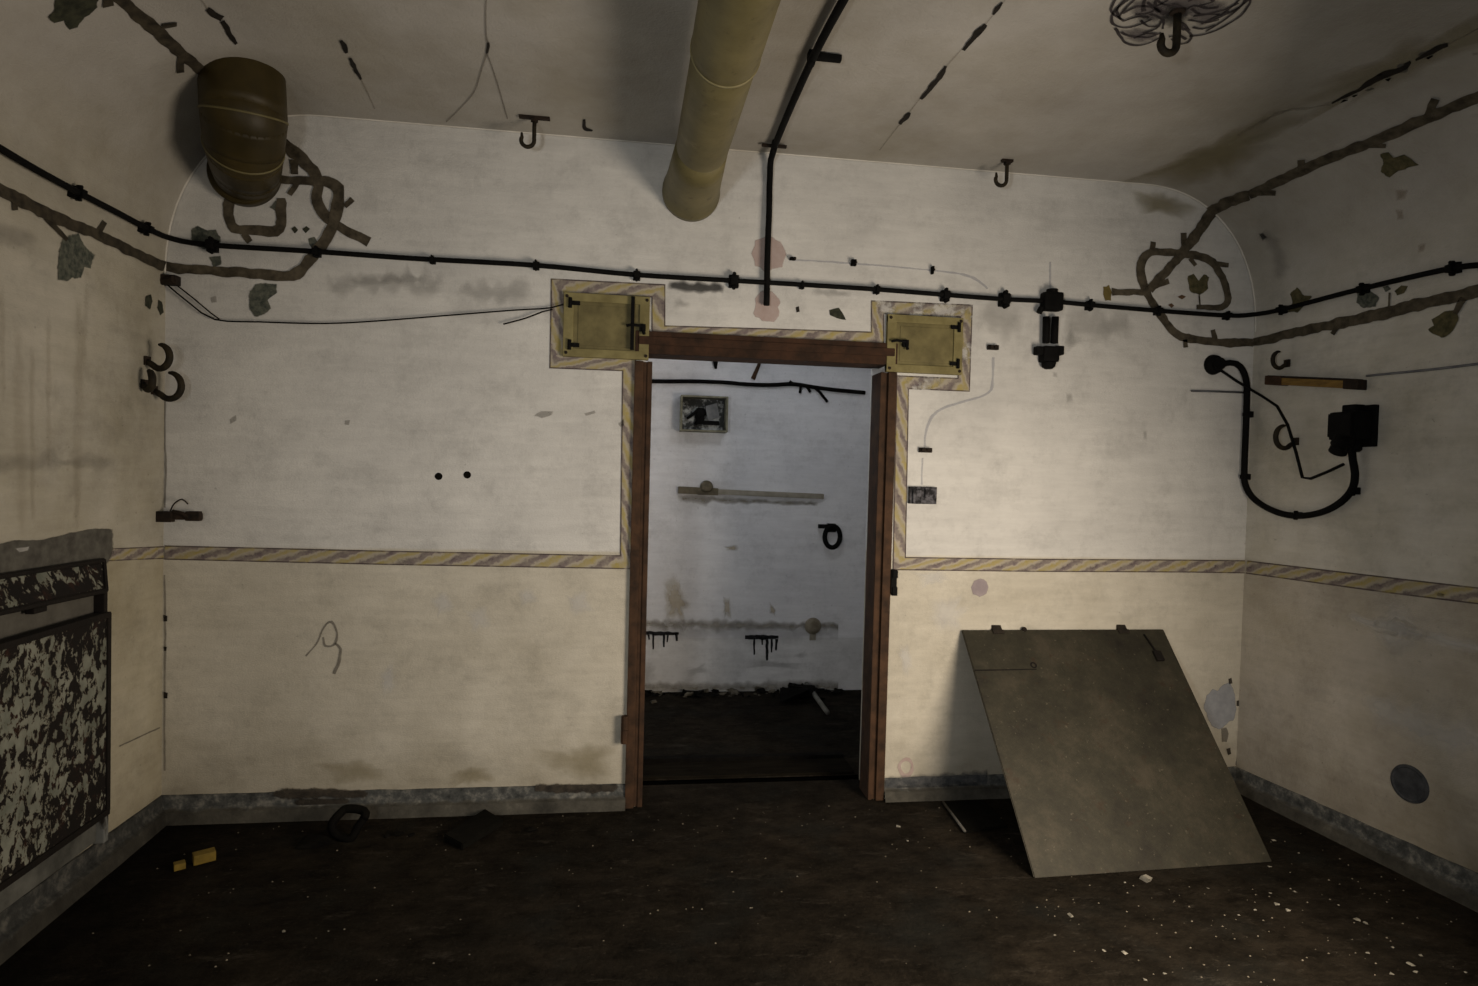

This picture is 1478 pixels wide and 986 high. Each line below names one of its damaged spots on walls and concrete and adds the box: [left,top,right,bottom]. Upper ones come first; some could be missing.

crack [899,2,1003,125]